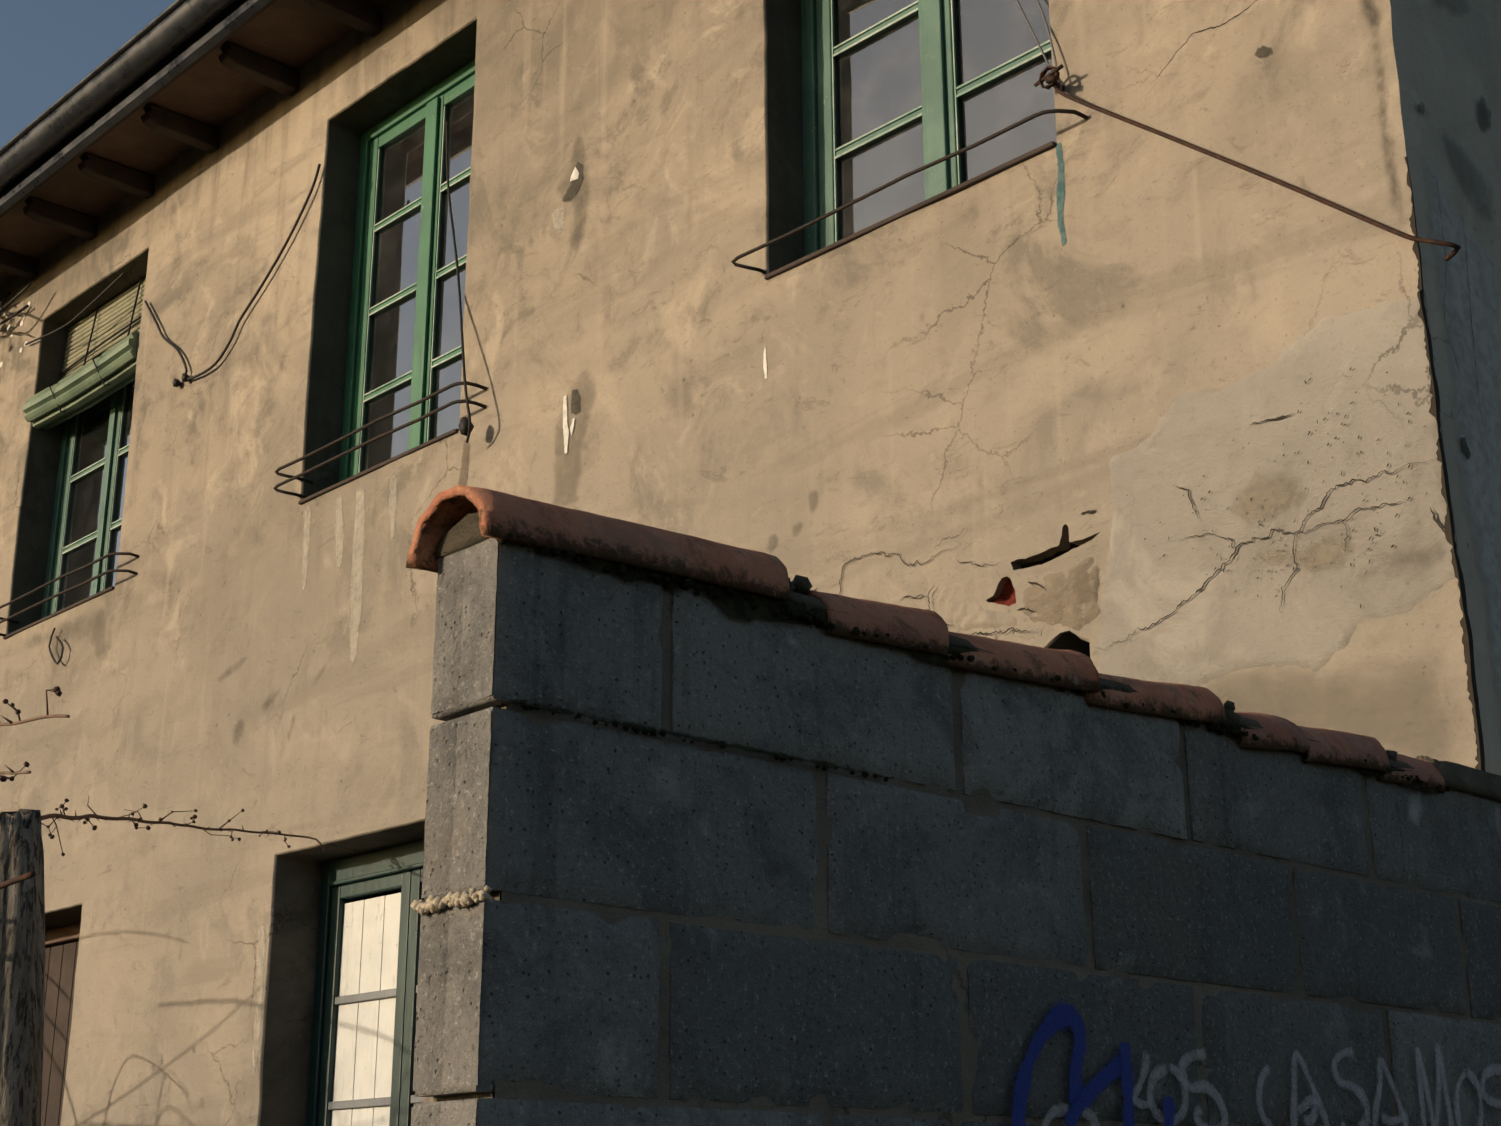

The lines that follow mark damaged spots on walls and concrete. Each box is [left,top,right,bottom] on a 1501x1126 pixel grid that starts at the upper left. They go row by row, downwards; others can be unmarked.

crack [1097,156,1491,772]
efflorescence [337,491,364,660]
crack [790,528,1047,640]
spalling [986,524,1100,606]